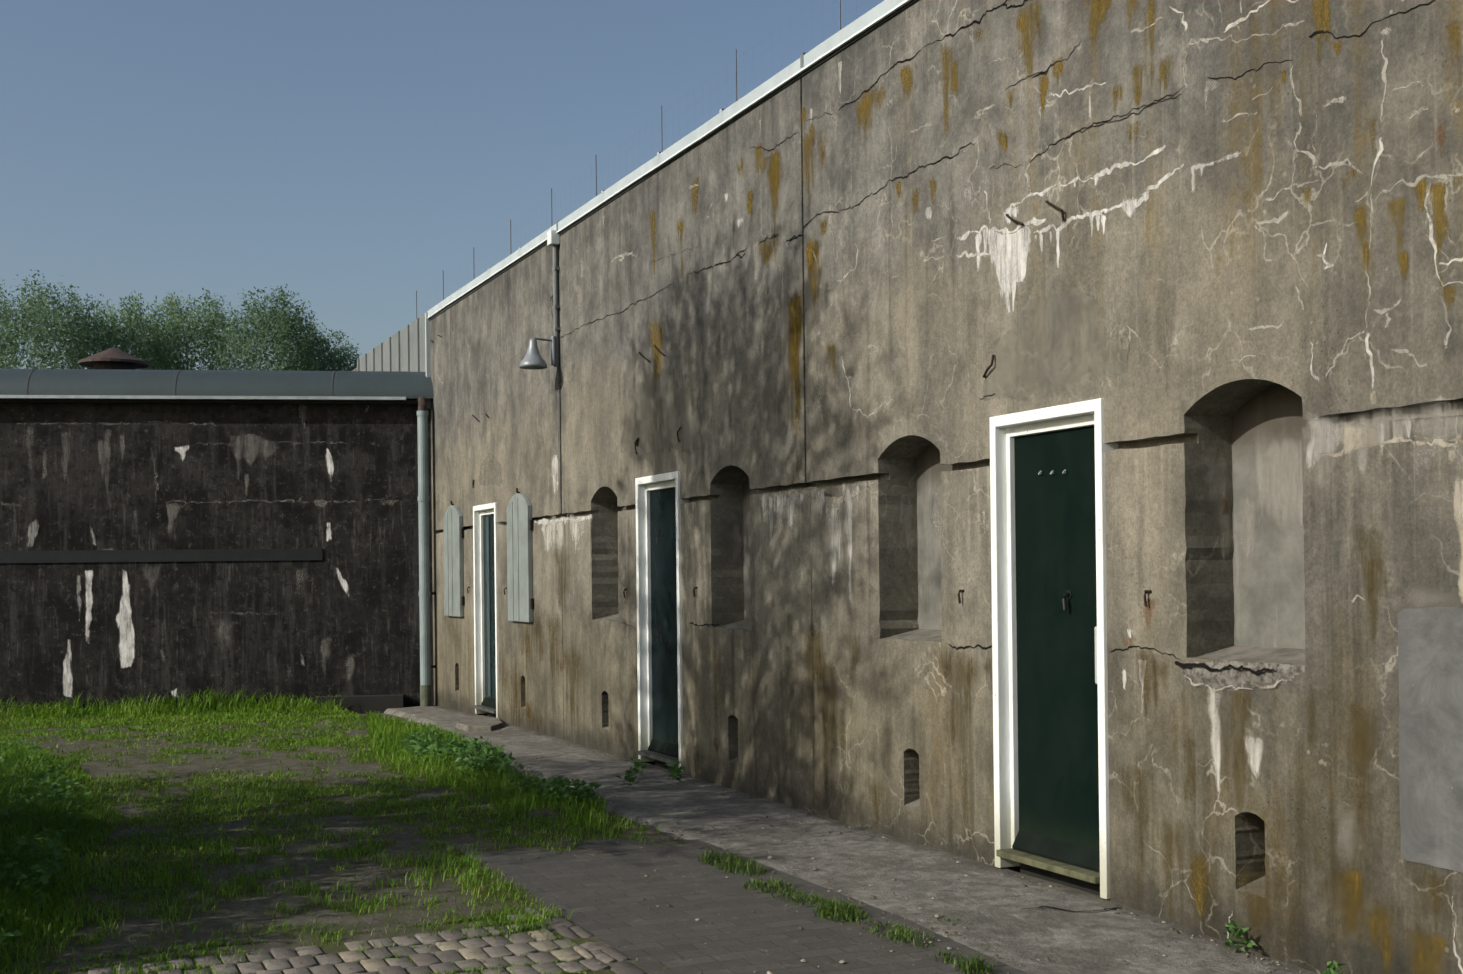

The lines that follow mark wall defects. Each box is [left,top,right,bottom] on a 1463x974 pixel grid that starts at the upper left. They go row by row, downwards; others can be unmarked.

crack [550,0,1434,338]
leakage [956,146,1239,313]
peeling [27,521,39,546]
peeling [63,571,93,697]
peeling [116,572,134,668]
spalling [1174,659,1305,691]